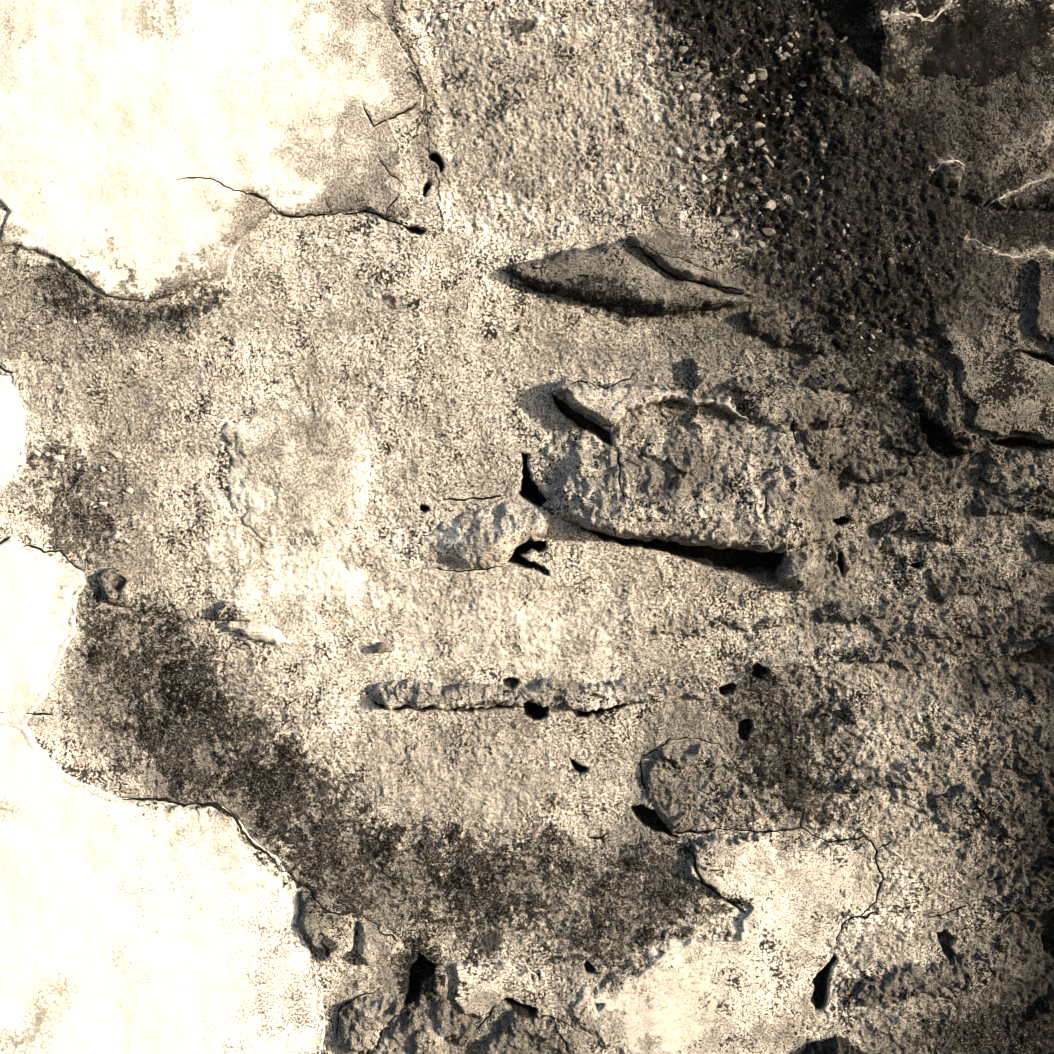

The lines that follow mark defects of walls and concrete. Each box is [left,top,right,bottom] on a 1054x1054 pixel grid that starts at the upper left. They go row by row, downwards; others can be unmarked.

damp [0,0,336,342]
spalling [0,0,887,369]
damp [382,293,397,315]
damp [424,0,1054,514]
spalling [937,323,1054,442]
spalling [0,489,325,1054]
damp [16,429,880,1054]
crack [639,737,724,790]
spalling [678,827,872,946]
crack [674,814,892,946]
spalling [452,960,547,1019]
spalling [566,947,665,1037]